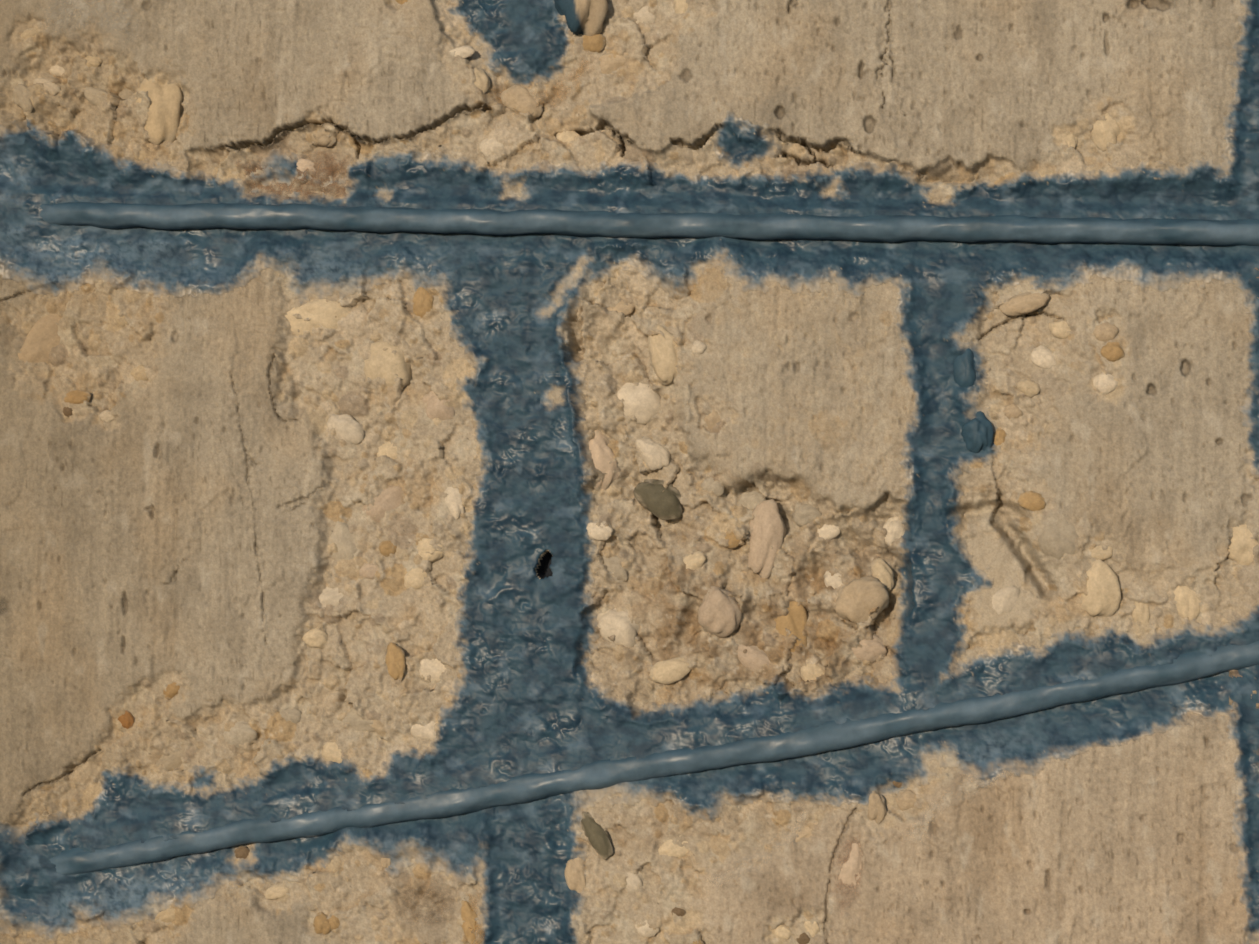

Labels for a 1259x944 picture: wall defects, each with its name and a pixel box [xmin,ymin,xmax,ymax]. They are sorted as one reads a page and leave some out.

crack [224,103,493,151]
spalling [2,0,1190,202]
crack [574,121,635,155]
crack [671,133,712,151]
crack [779,132,856,169]
spalling [0,272,481,827]
spalling [564,263,905,712]
spalling [954,278,1259,664]
spalling [0,845,482,944]
crack [824,804,861,944]